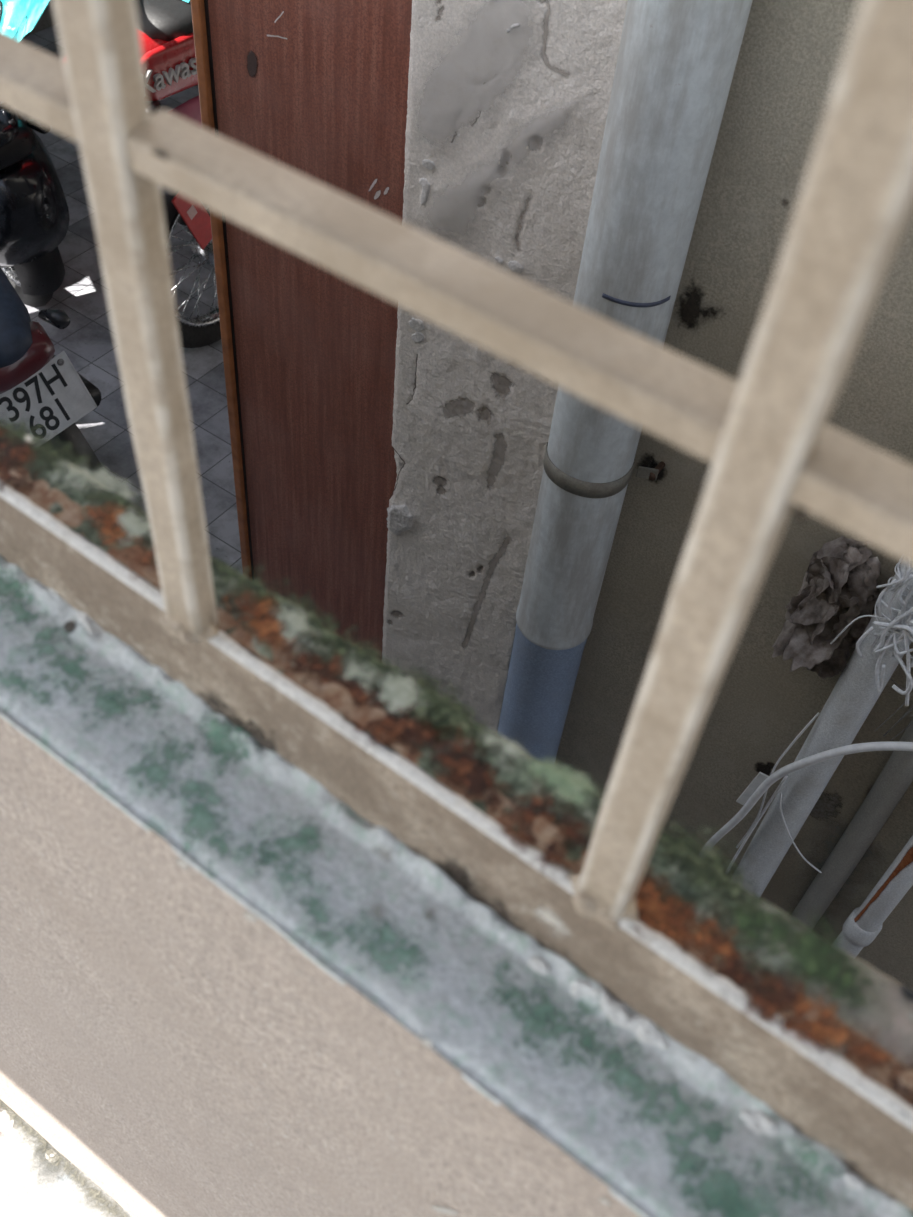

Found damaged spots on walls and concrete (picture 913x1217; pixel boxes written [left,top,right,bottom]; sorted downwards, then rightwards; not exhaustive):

flaking render [443,373,512,487]
flaking render [433,476,446,494]
water stain [272,605,315,640]
water stain [345,661,422,712]
water stain [481,728,599,806]
rust [854,845,913,922]